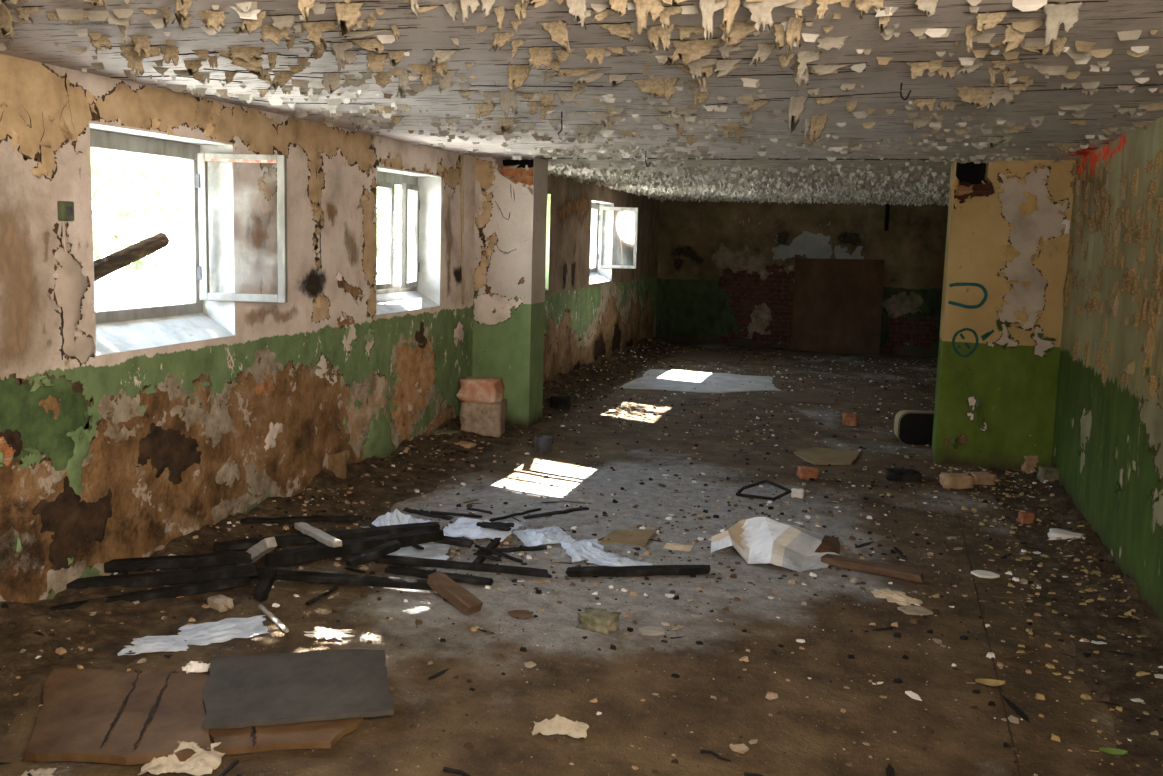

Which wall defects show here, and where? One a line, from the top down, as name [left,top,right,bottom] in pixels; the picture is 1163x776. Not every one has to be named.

crack [58,307,66,360]
flaking render [0,0,1163,603]
water stain [0,503,53,582]
peeling [898,605,933,616]